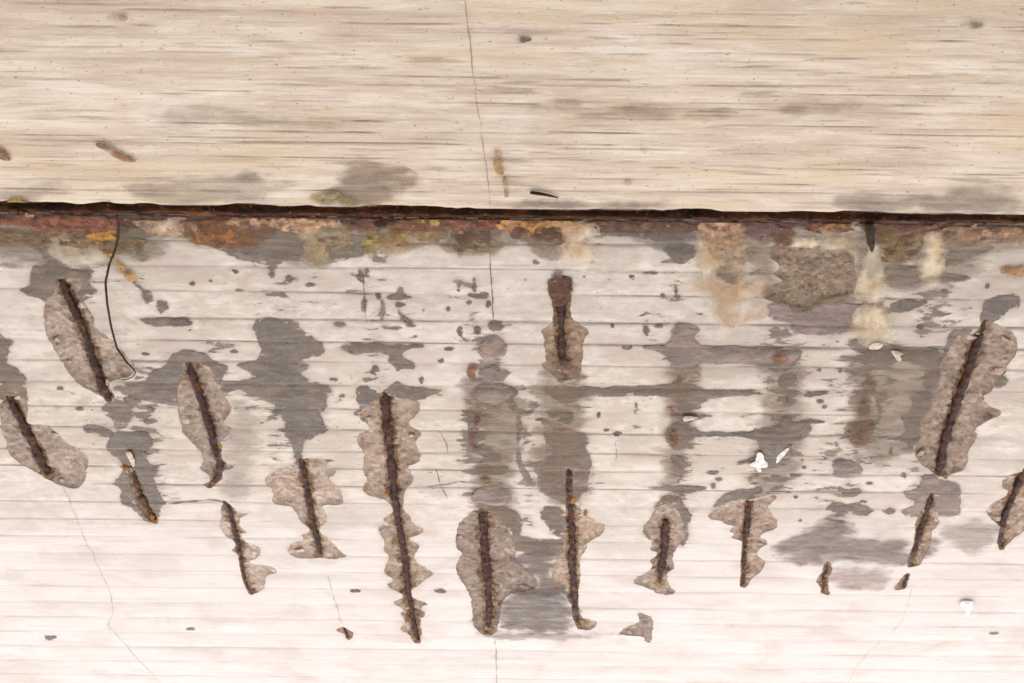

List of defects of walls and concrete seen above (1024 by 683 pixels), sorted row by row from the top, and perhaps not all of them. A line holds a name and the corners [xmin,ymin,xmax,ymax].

crack [487,248,495,317]
corrosion [0,192,1024,282]
damp [559,225,593,262]
damp [632,230,778,327]
damp [789,228,1024,334]
spalling [0,335,89,489]
spalling [20,239,441,643]
damp [461,373,588,527]
spalling [455,275,828,636]
spalling [761,244,1024,595]
damp [486,553,590,638]
damp [776,517,912,590]